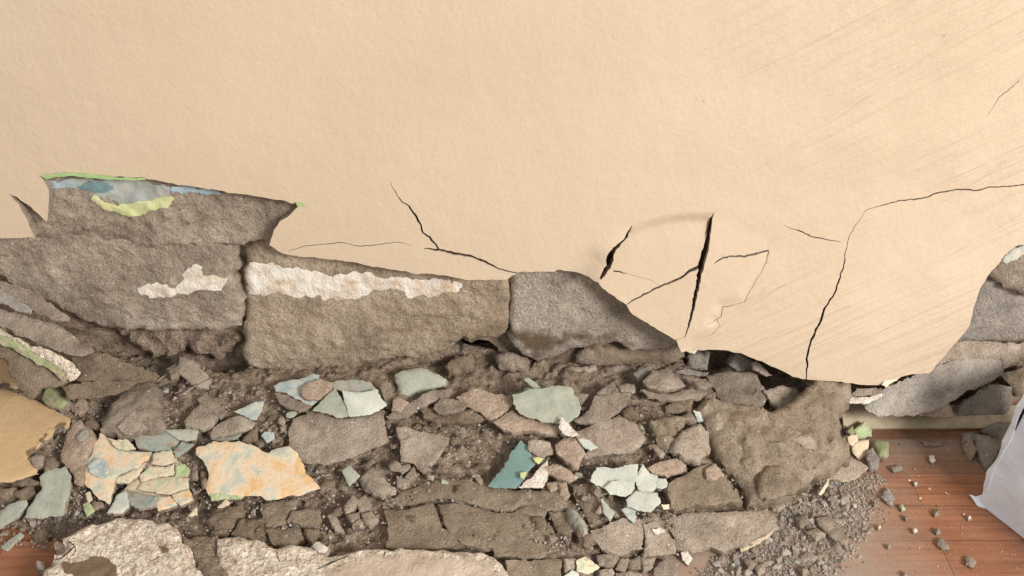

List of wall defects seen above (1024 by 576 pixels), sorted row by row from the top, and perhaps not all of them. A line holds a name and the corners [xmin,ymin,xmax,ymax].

crack [296,184,517,273]
flaking render [0,172,786,379]
crack [603,212,714,323]
crack [786,184,1024,380]
flaking render [957,245,1024,343]
peeling [512,378,542,397]
flaking render [850,374,913,398]
flaking render [953,358,1024,401]
peeling [234,401,264,420]
peeling [27,422,66,458]
peeling [261,432,275,443]